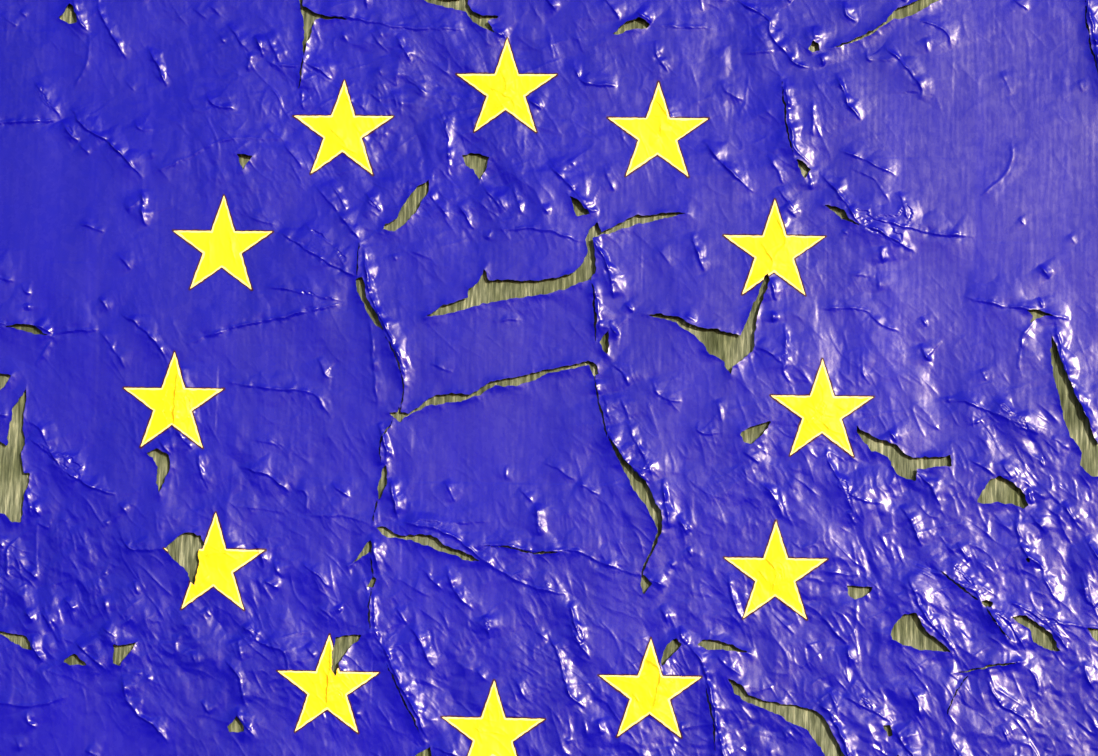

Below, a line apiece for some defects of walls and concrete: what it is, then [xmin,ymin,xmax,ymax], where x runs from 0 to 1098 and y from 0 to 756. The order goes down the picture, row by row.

peeling [379,176,433,234]
peeling [421,191,691,320]
peeling [642,273,773,378]
peeling [1046,331,1098,480]
peeling [0,370,35,526]
crack [352,240,666,745]
peeling [853,421,956,485]
peeling [975,472,1033,512]
peeling [162,529,205,585]
peeling [886,609,955,656]
peeling [724,674,850,756]
peeling [879,721,903,756]